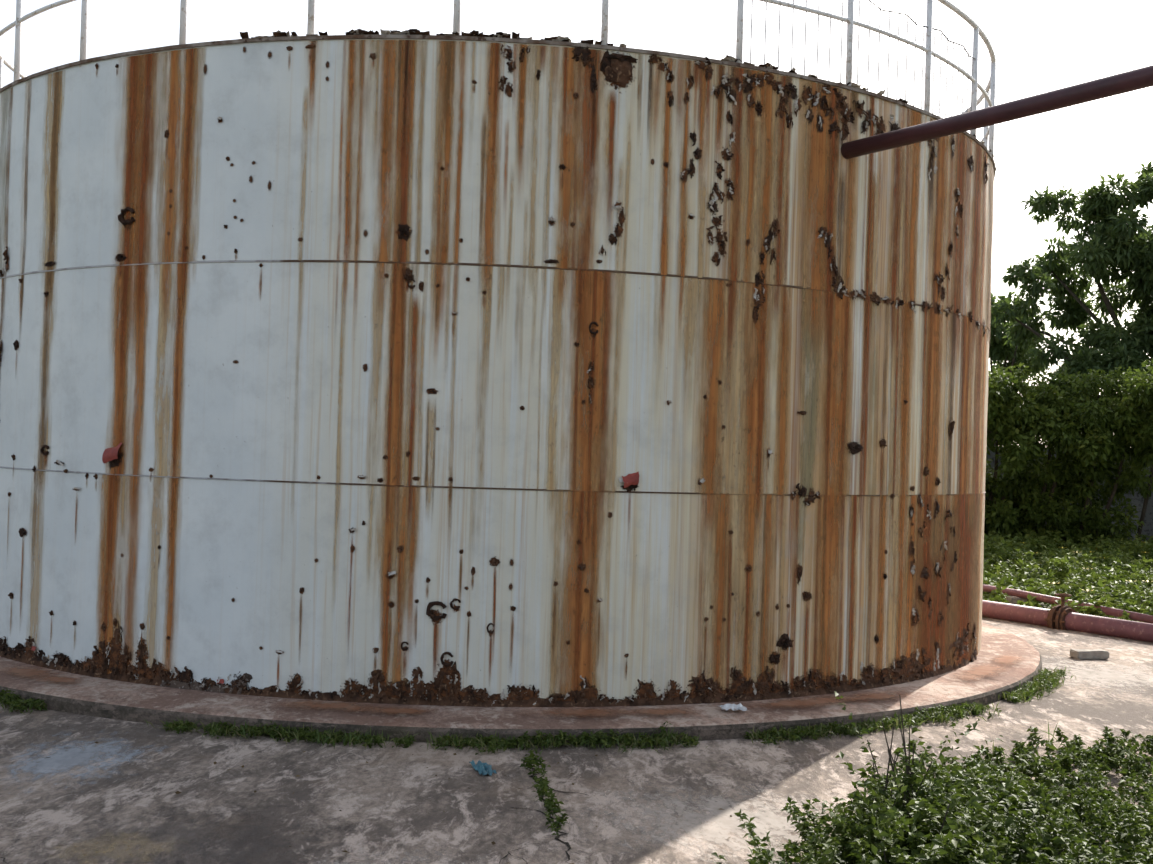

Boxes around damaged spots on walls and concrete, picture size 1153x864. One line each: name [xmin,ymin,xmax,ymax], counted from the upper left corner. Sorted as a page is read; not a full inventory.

corrosion [0,40,1021,716]